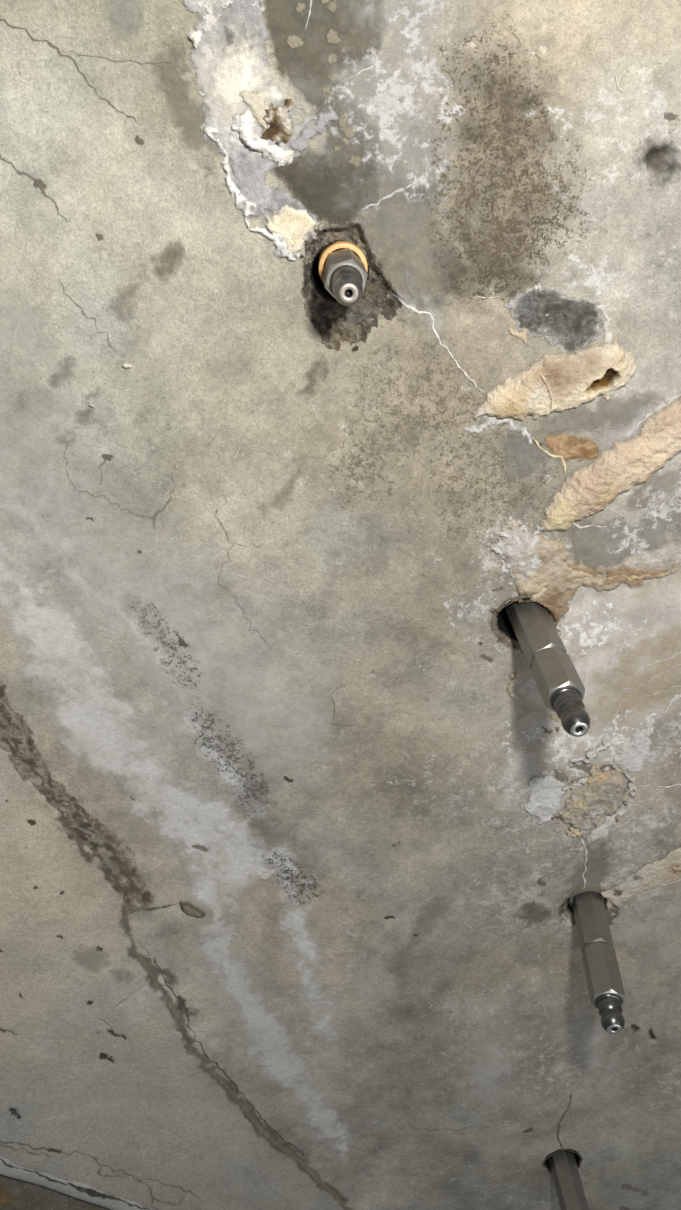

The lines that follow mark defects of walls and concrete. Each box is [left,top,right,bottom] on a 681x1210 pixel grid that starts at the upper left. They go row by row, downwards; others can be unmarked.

crack [0,19,169,124]
damp [157,0,676,308]
crack [378,271,485,393]
damp [464,366,681,479]
damp [0,394,349,1158]
crack [0,678,350,1210]